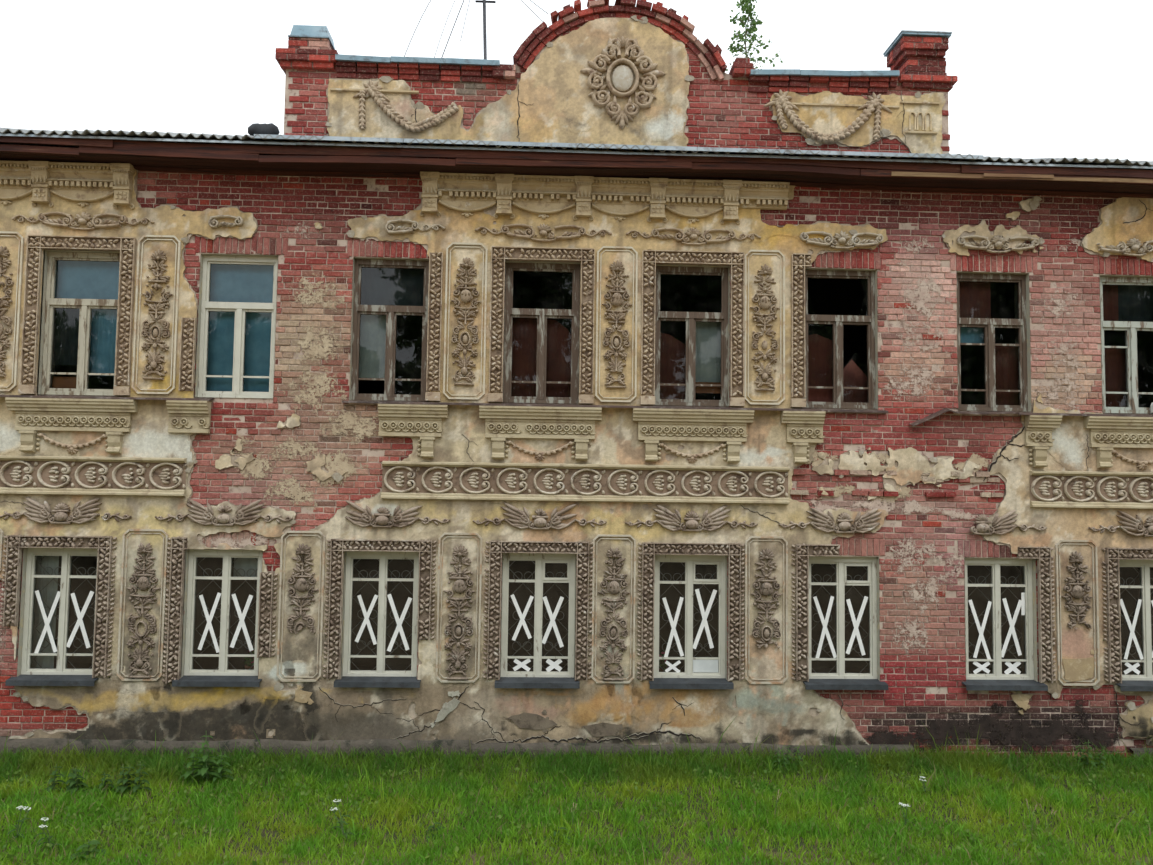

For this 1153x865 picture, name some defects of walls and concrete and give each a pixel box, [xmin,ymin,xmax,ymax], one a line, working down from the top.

flaking render [137,171,429,531]
flaking render [760,186,1153,760]
crack [983,427,1025,481]
flaking render [0,556,88,737]
flaking render [202,530,280,571]
damp [430,540,489,692]
crack [319,686,702,744]
damp [15,562,1153,754]
damp [1084,531,1107,646]